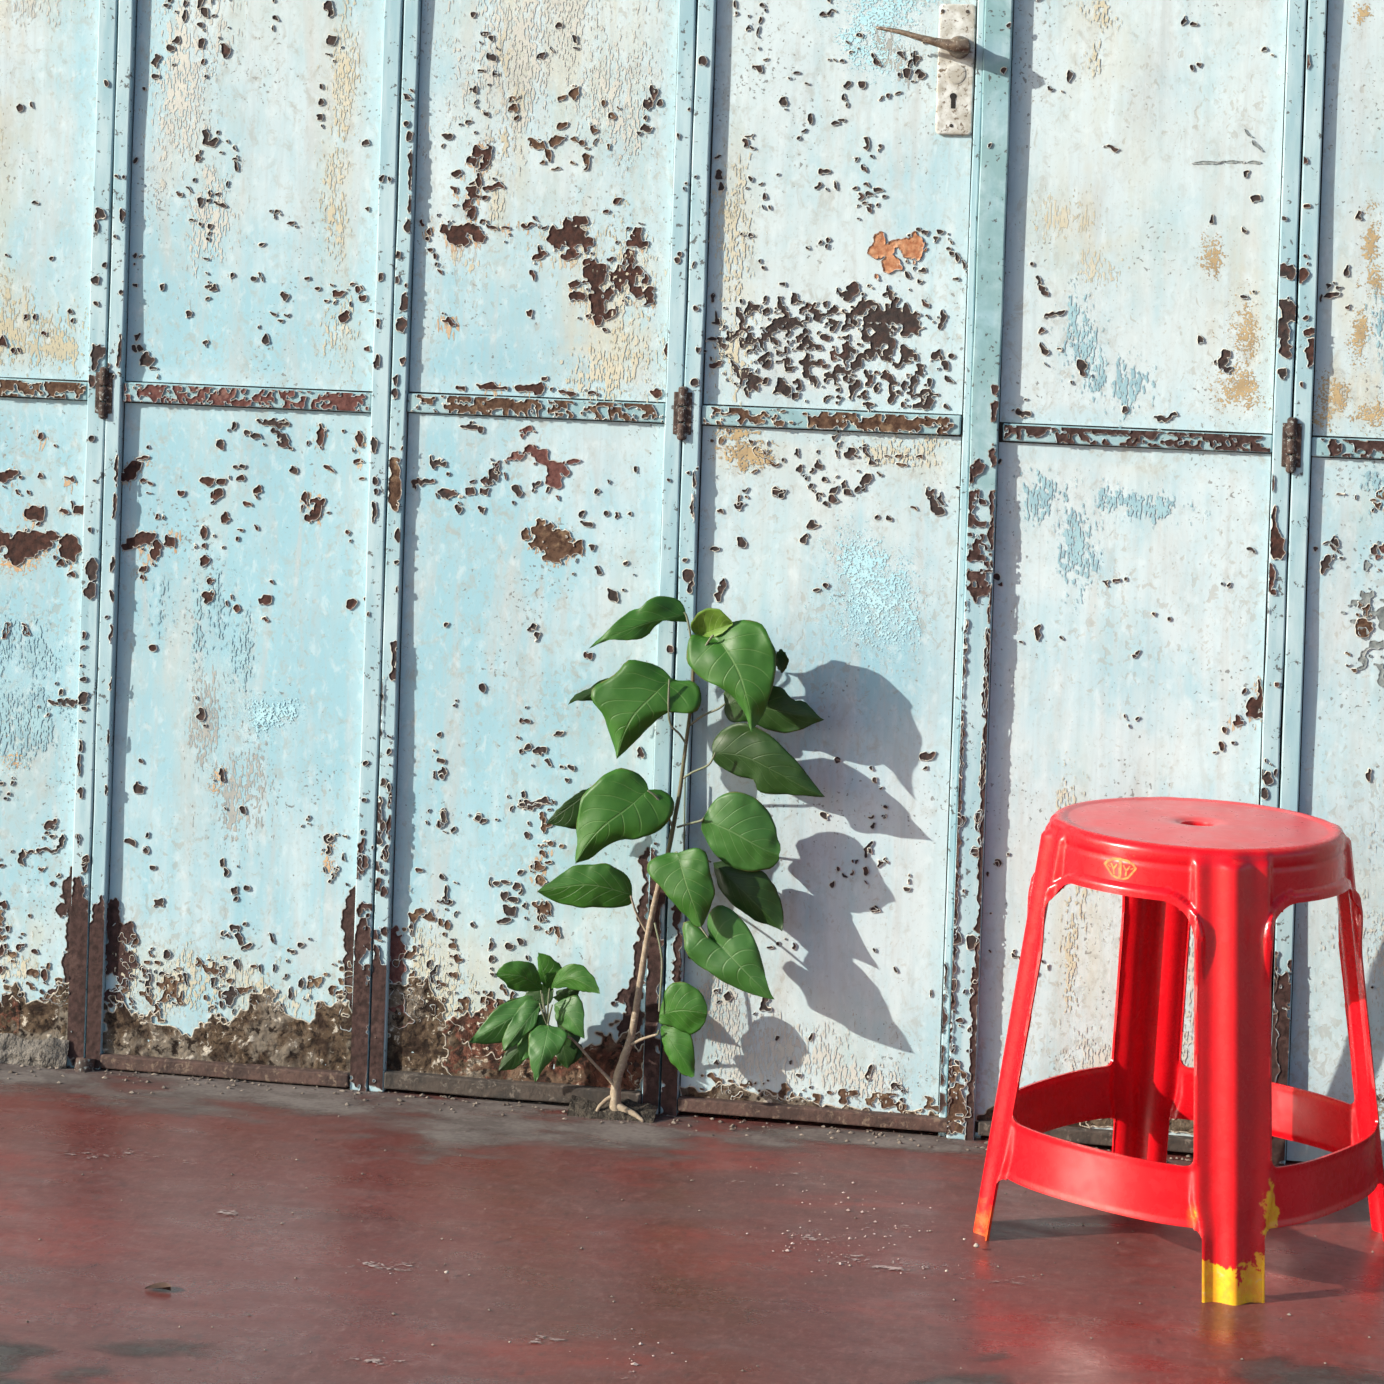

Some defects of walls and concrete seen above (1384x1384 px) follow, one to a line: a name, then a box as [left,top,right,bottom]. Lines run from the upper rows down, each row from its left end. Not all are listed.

corrosion [1347,0,1375,29]
corrosion [496,19,534,111]
corrosion [379,88,955,524]
peeling [1335,486,1384,512]
peeling [1313,535,1344,575]
corrosion [0,186,1384,1141]
corrosion [1272,1136,1285,1166]